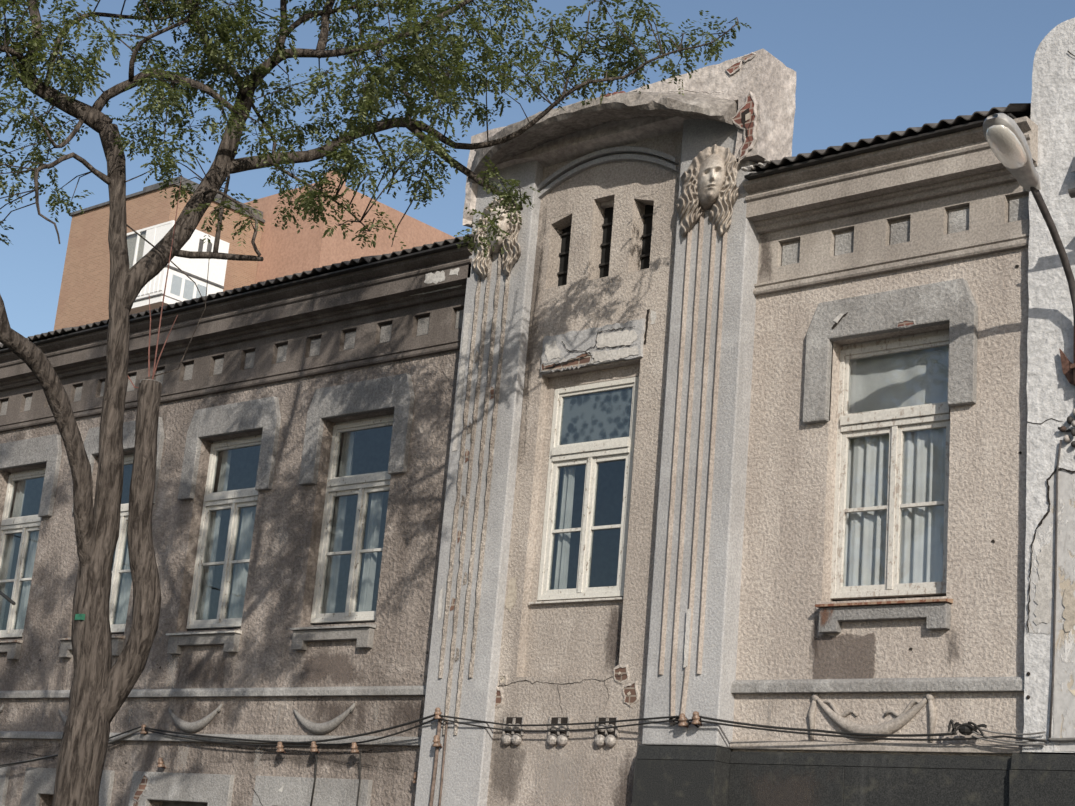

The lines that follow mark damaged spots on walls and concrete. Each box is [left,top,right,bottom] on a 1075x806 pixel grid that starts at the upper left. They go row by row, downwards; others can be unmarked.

flaking render [725,52,756,75]
flaking render [732,91,758,161]
peeling [540,309,657,373]
peeling [1027,467,1075,752]
crack [499,674,627,703]
flaking render [612,664,639,708]